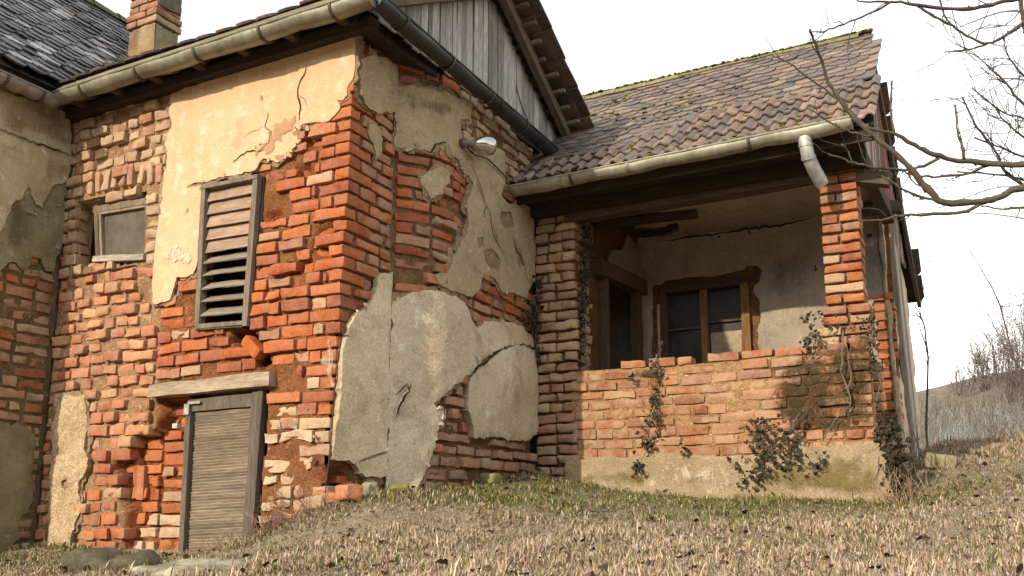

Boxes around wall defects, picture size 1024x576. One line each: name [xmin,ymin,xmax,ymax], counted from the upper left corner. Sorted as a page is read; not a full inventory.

flaking render [361,41,533,205]
crack [657,217,816,244]
flaking render [0,258,54,551]
flaking render [153,84,473,534]
flaking render [420,359,538,489]
crack [471,351,501,376]
flaking render [461,271,535,340]
efflorescence [682,466,728,484]